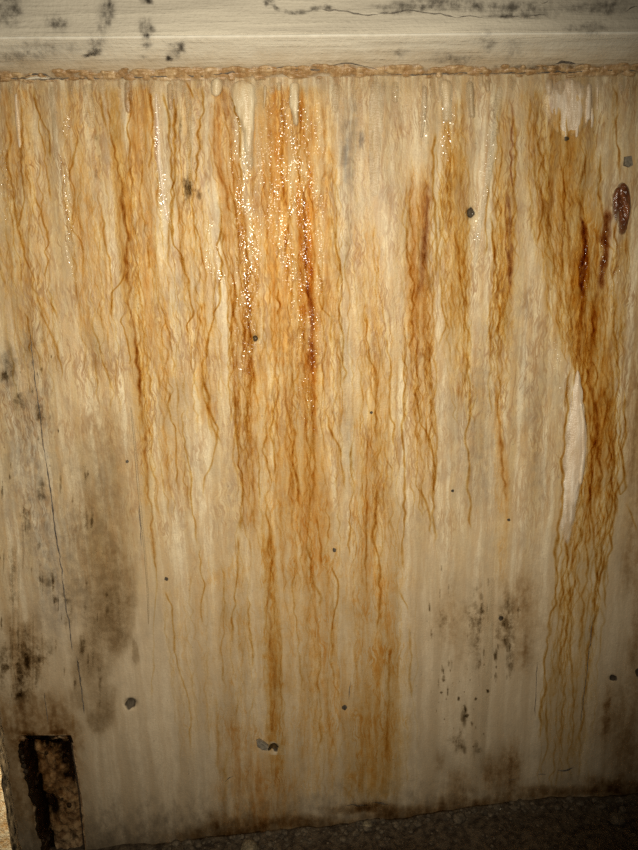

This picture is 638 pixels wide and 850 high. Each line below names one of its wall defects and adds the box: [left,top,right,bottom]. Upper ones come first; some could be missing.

rust [579,221,587,290]
rust [600,213,615,284]
water stain [561,370,588,527]
crack [30,334,84,711]
spalling [18,735,86,850]